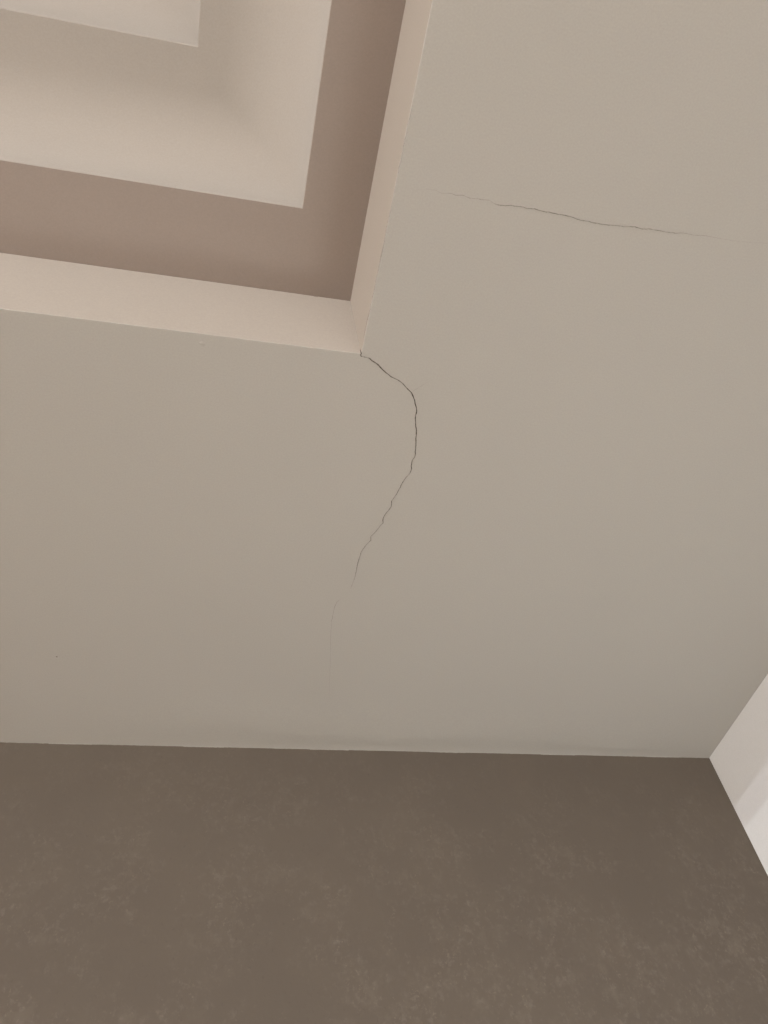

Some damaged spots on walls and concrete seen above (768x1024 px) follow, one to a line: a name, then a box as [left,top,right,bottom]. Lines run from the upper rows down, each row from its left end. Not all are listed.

crack [360,350,417,518]